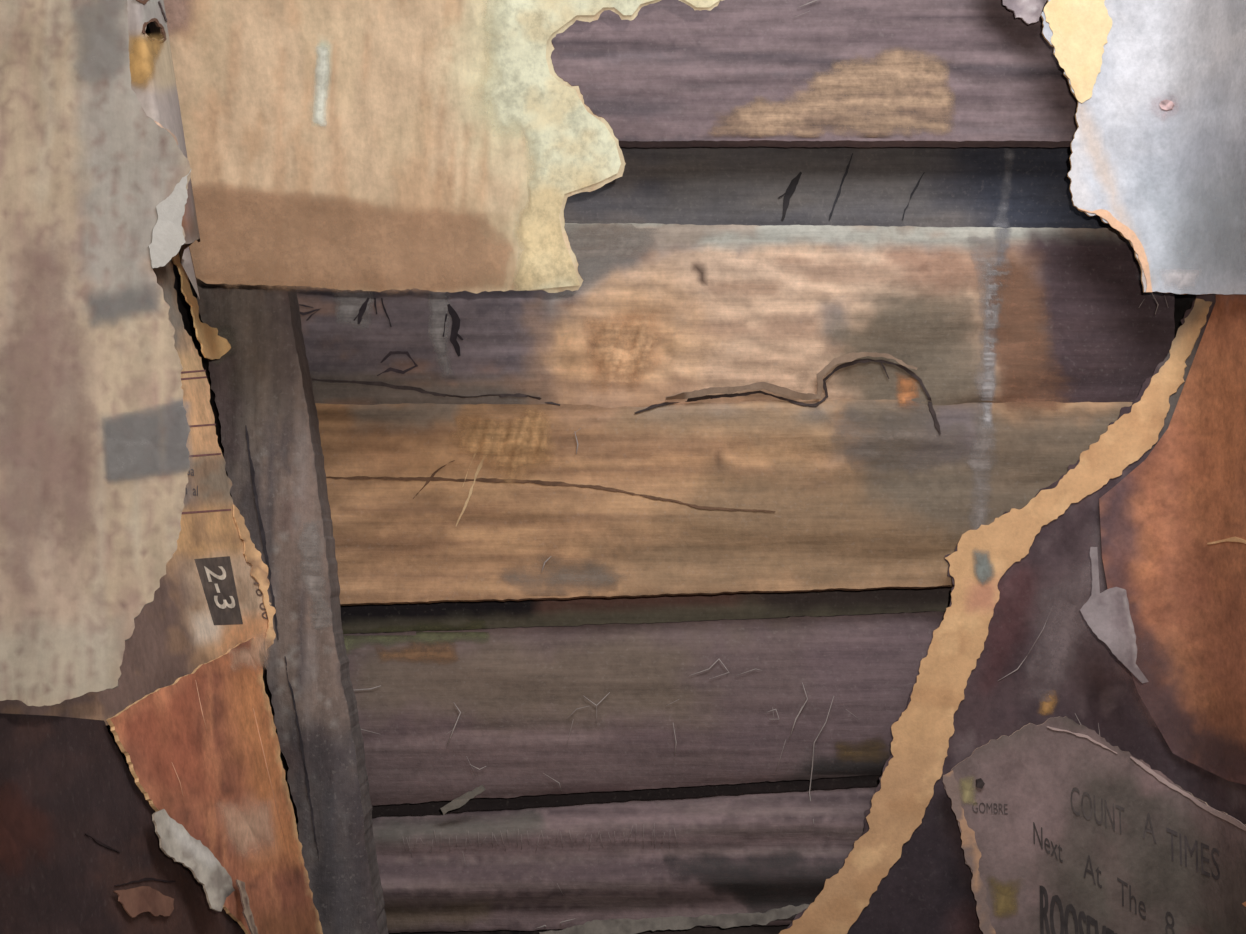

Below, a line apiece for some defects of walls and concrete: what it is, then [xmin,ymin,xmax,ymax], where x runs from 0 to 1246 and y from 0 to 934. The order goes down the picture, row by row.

peeling [486,0,653,291]
crack [778,172,802,221]
crack [829,153,853,220]
crack [902,172,925,220]
crack [635,358,941,434]
crack [326,460,775,512]